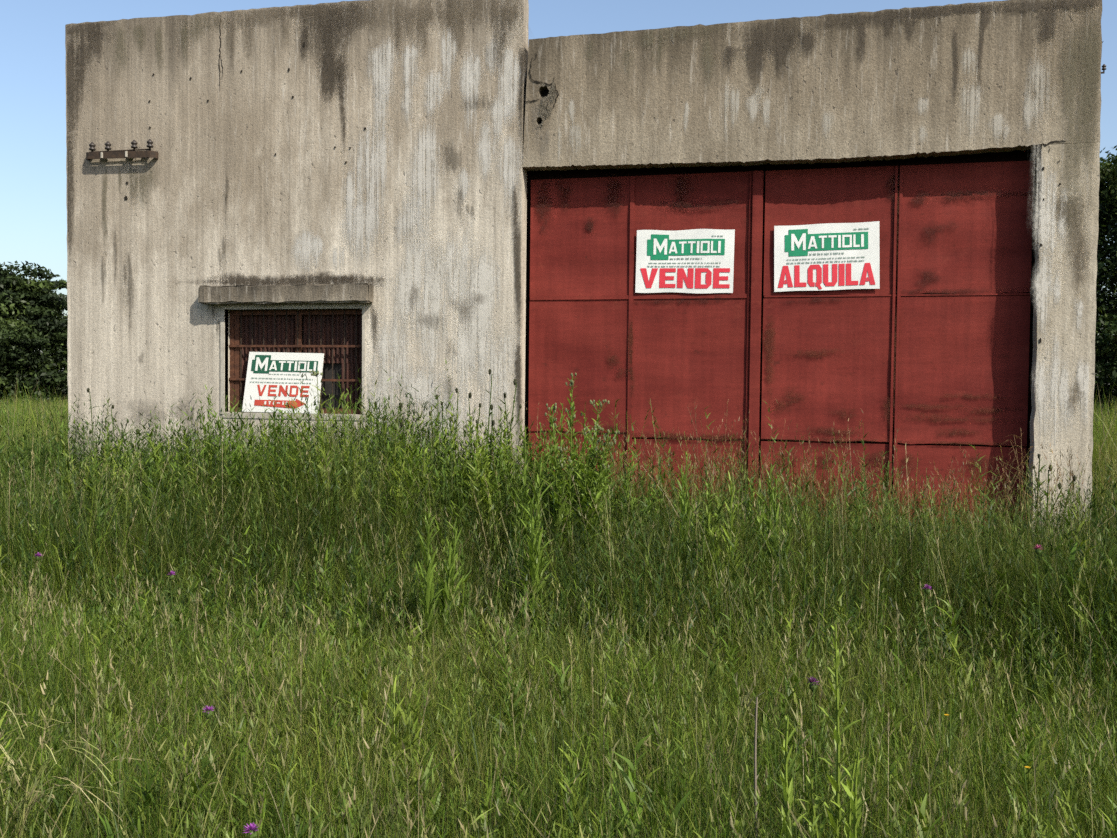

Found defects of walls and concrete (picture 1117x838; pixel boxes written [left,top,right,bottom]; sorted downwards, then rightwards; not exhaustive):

water stain [724,21,814,129]
water stain [857,26,866,58]
water stain [953,0,1095,137]
water stain [67,23,101,251]
water stain [102,171,121,224]
water stain [223,0,528,332]
water stain [1057,200,1085,279]